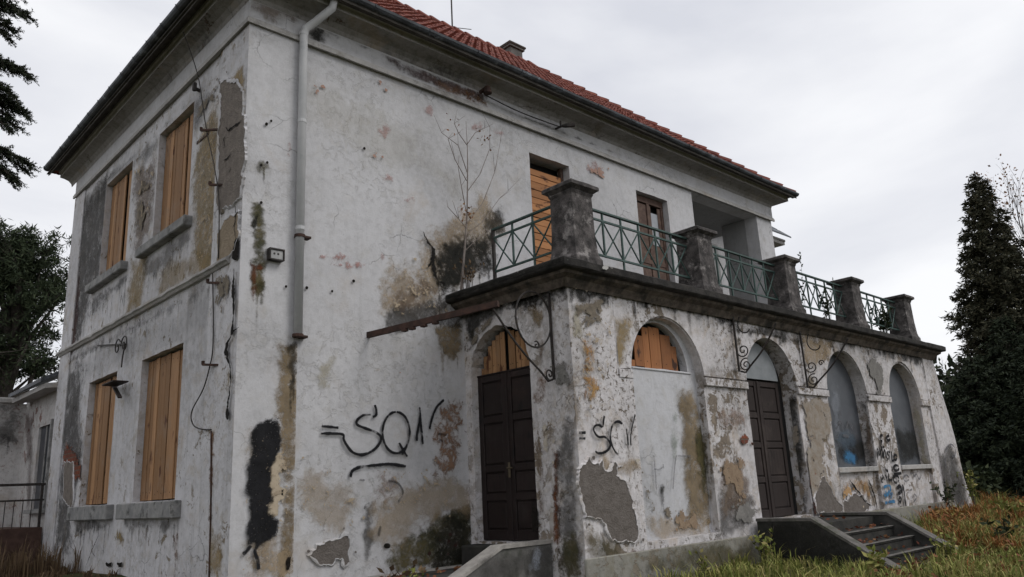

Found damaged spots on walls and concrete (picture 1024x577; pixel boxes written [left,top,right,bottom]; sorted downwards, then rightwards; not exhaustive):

damp [390,59,488,107]
damp [75,176,146,341]
spalling [197,71,248,313]
damp [251,202,267,303]
damp [383,197,611,400]
spalling [62,444,81,507]
damp [253,344,297,577]
spalling [264,447,365,569]
spalling [576,456,644,545]
peeling [716,434,760,524]
damp [658,389,874,572]
spalling [789,372,871,516]